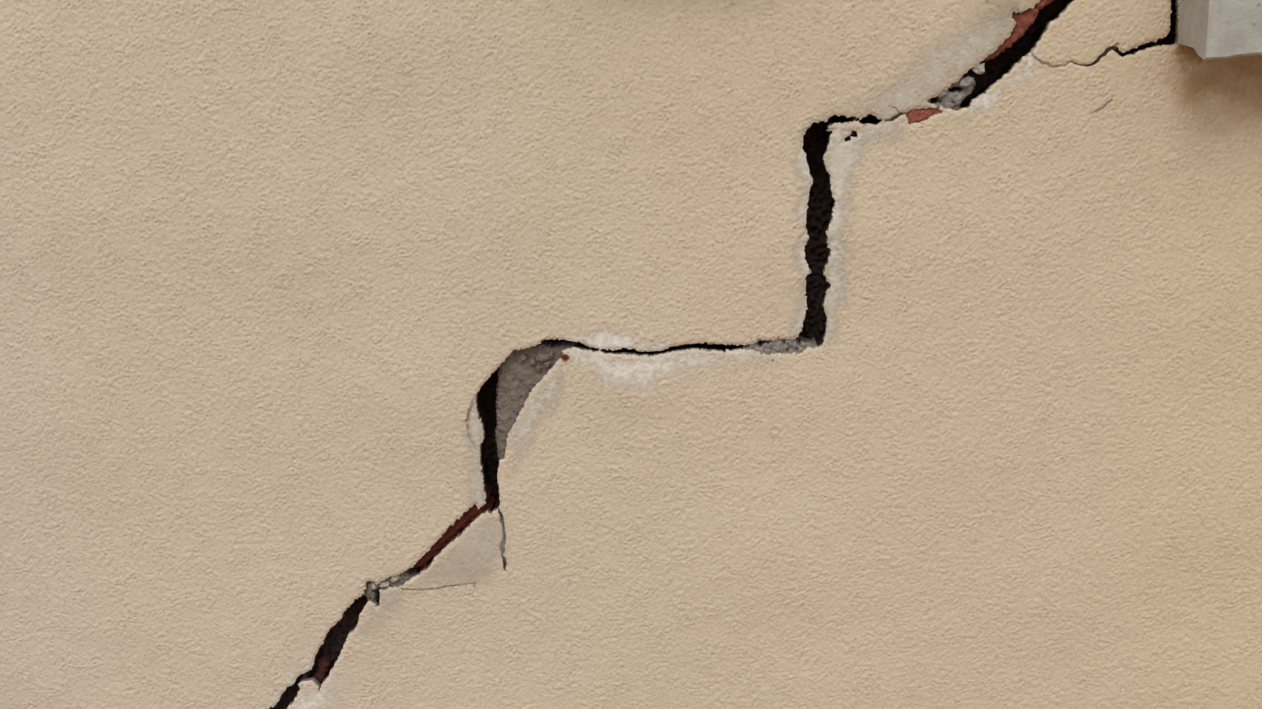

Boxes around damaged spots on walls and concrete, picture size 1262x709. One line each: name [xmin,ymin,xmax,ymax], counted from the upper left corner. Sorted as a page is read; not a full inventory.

peeling [789,0,1054,346]
flaking render [466,329,786,508]
crack [269,0,1179,709]
peeling [267,654,333,709]